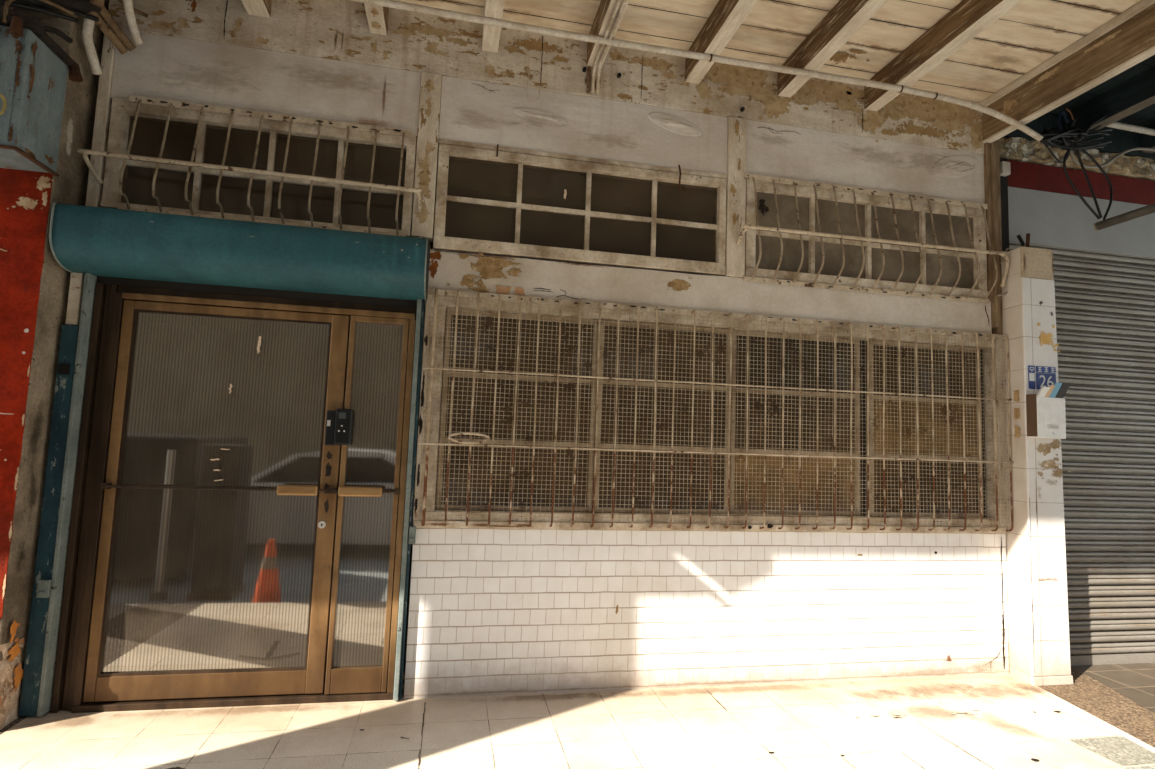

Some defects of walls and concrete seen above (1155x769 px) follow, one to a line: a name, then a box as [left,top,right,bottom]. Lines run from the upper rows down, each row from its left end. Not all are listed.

peeling [136,0,197,36]
peeling [359,7,509,82]
peeling [499,28,578,77]
spalling [608,49,1155,181]
spalling [667,277,692,291]
peeling [1036,439,1070,482]
spalling [0,612,25,730]